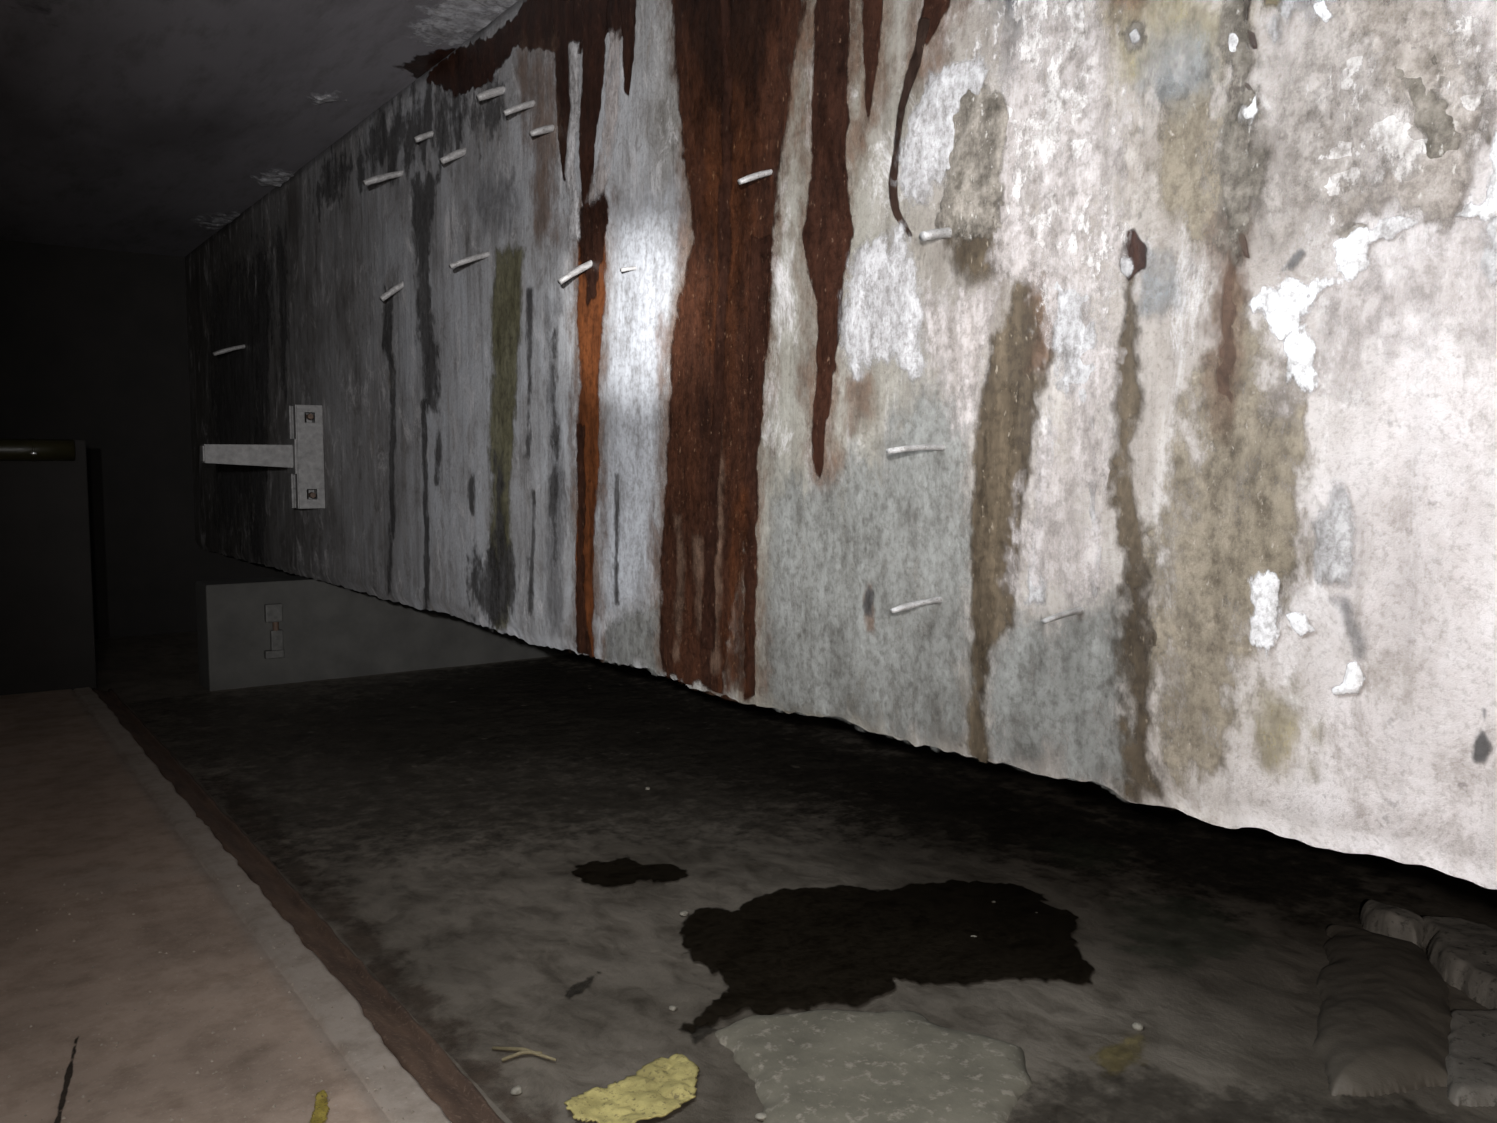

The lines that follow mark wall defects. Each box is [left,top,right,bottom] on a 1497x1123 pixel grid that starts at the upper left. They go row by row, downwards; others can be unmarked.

water stain [251,169,294,187]
water stain [311,74,505,610]
water stain [466,245,565,632]
rust [396,0,636,658]
rust [651,0,888,700]
rust [888,0,968,237]
water stain [839,0,1228,803]